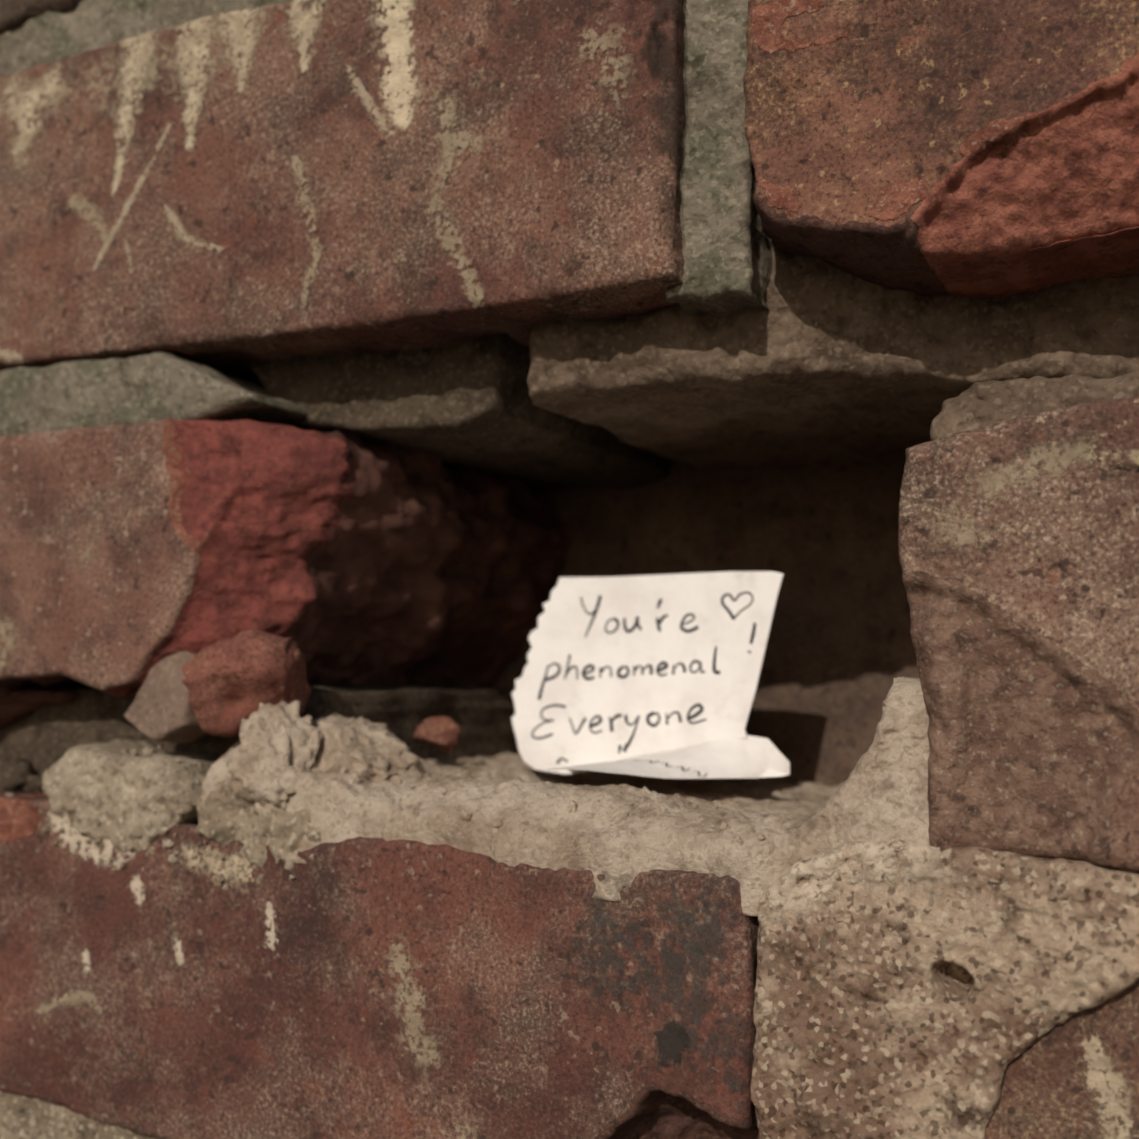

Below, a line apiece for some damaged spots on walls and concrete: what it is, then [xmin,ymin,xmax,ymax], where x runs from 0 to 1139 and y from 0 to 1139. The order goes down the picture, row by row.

peeling [750,0,849,53]
spalling [754,52,1139,298]
peeling [655,1019,687,1068]
spalling [595,1083,759,1139]